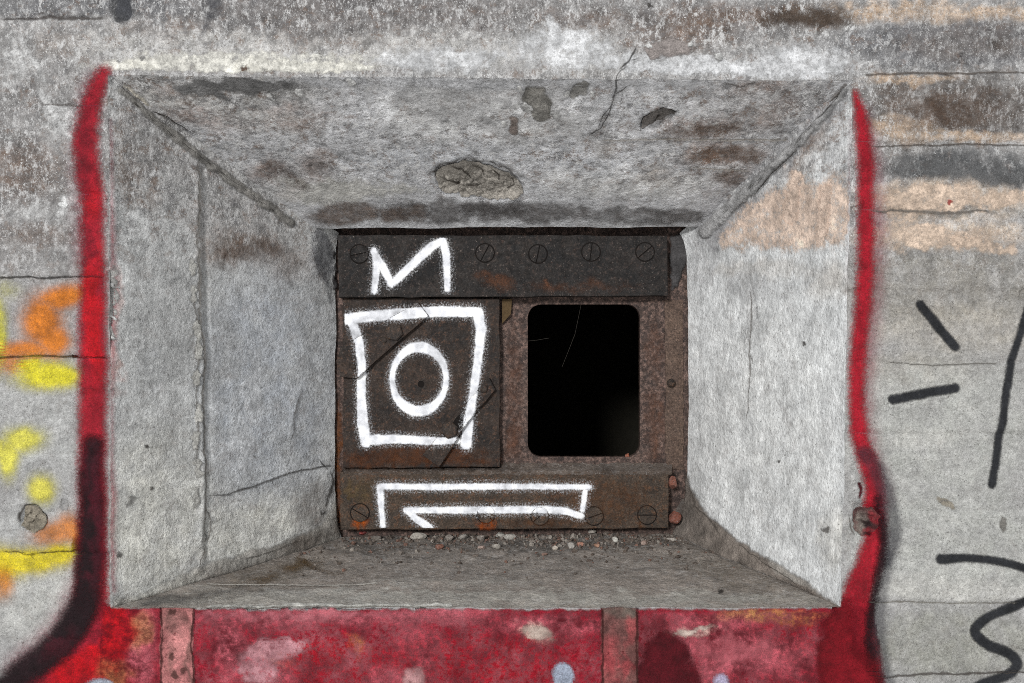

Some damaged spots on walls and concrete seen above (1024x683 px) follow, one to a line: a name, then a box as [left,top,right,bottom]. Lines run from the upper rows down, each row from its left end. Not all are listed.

peeling [501,86,560,135]
peeling [564,81,594,99]
crack [591,48,786,142]
spalling [434,158,523,200]
damp [269,171,701,276]
crack [189,165,334,541]